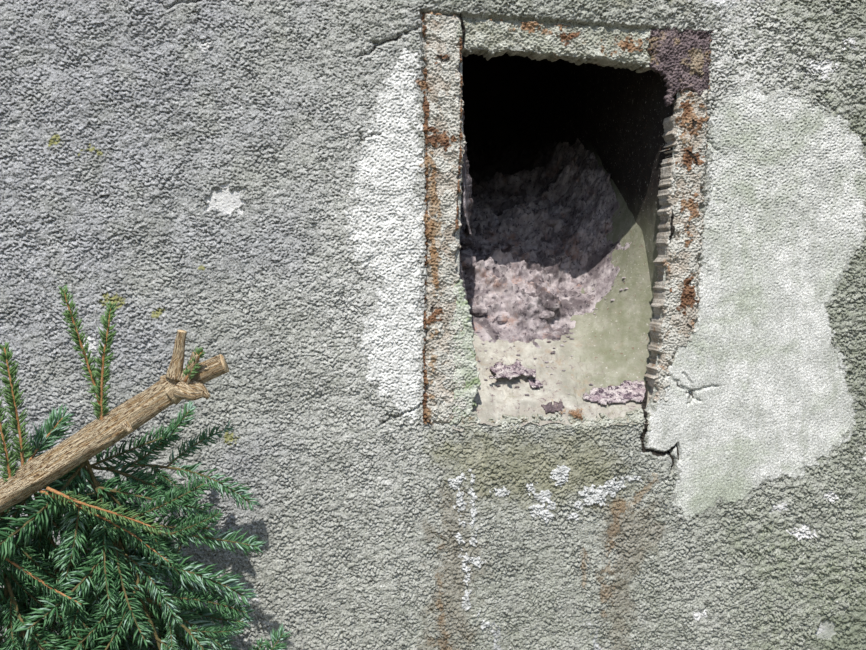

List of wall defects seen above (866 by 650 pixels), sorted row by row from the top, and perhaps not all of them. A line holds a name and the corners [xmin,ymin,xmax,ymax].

crack [357,26,419,57]
rust [675,92,709,172]
spalling [205,182,246,217]
rust [416,37,463,424]
peeling [426,13,651,437]
peeling [654,89,710,402]
rust [680,191,704,247]
rust [669,273,700,315]
crack [640,381,679,468]
damp [526,465,571,524]
damp [567,474,642,521]
damp [447,469,501,650]